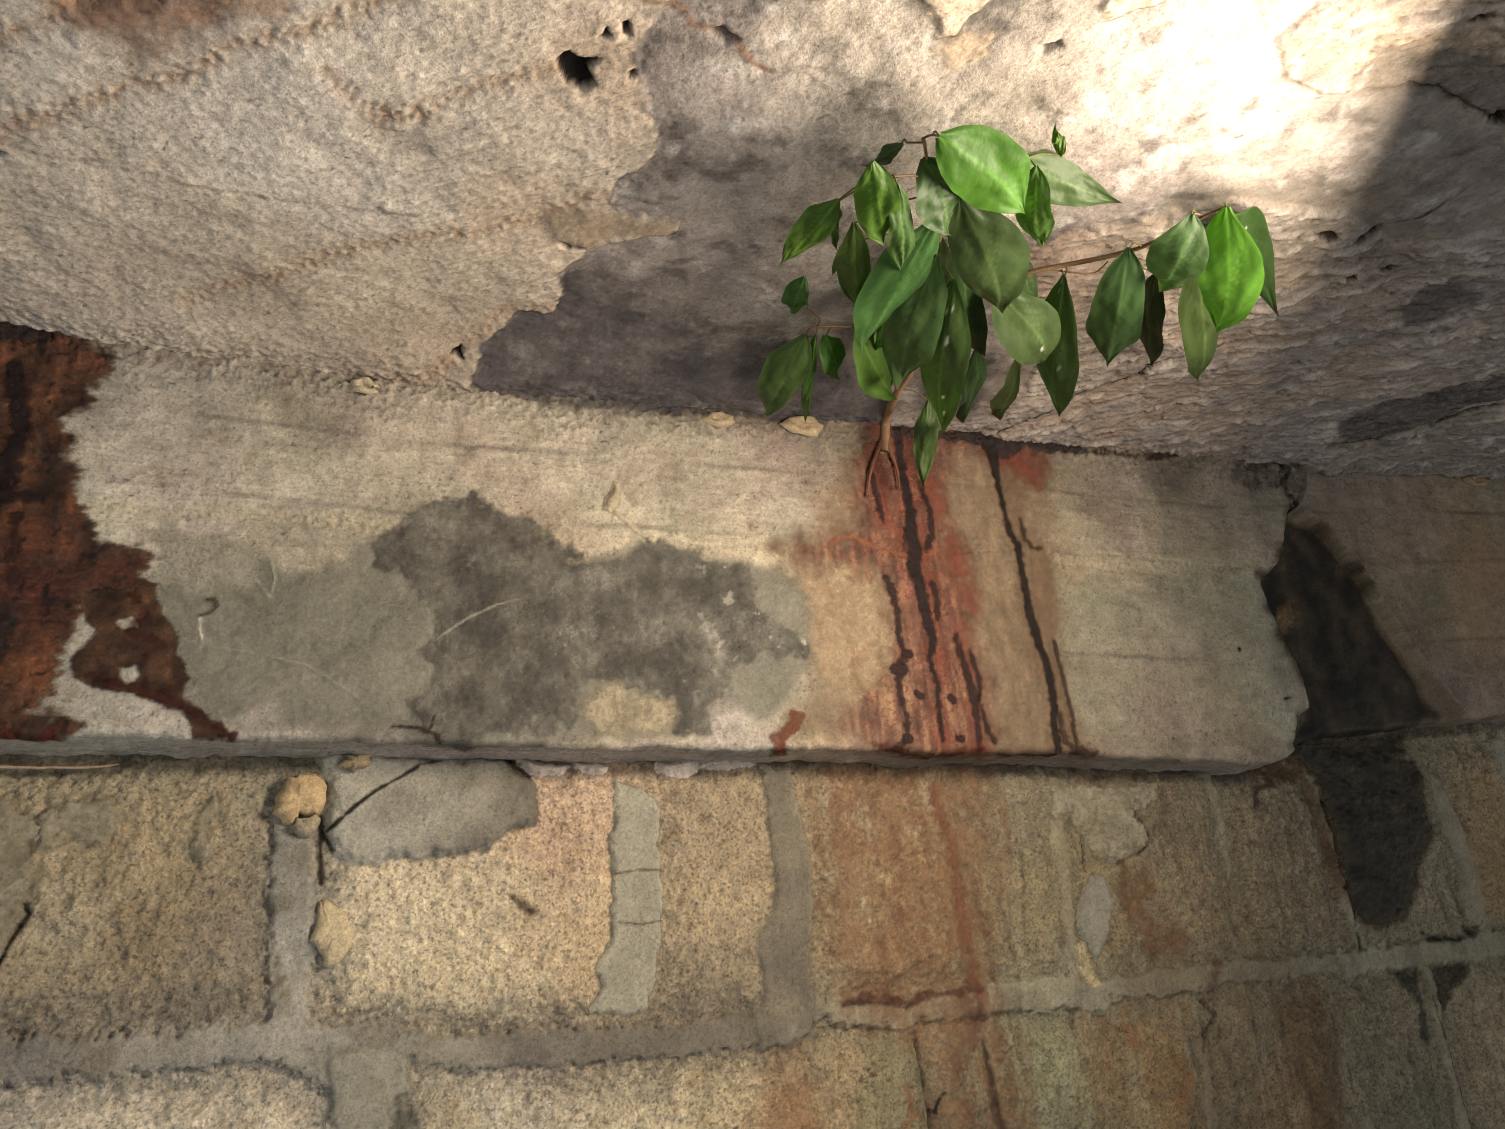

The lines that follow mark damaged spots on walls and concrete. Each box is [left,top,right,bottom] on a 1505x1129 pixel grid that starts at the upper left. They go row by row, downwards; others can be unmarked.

peeling [451,0,1505,443]
corrosion [0,321,238,742]
water stain [155,425,922,779]
corrosion [770,710,804,756]
corrosion [798,422,997,759]
water stain [920,431,1098,759]
water stain [1249,516,1439,929]
corrosion [845,987,983,1006]